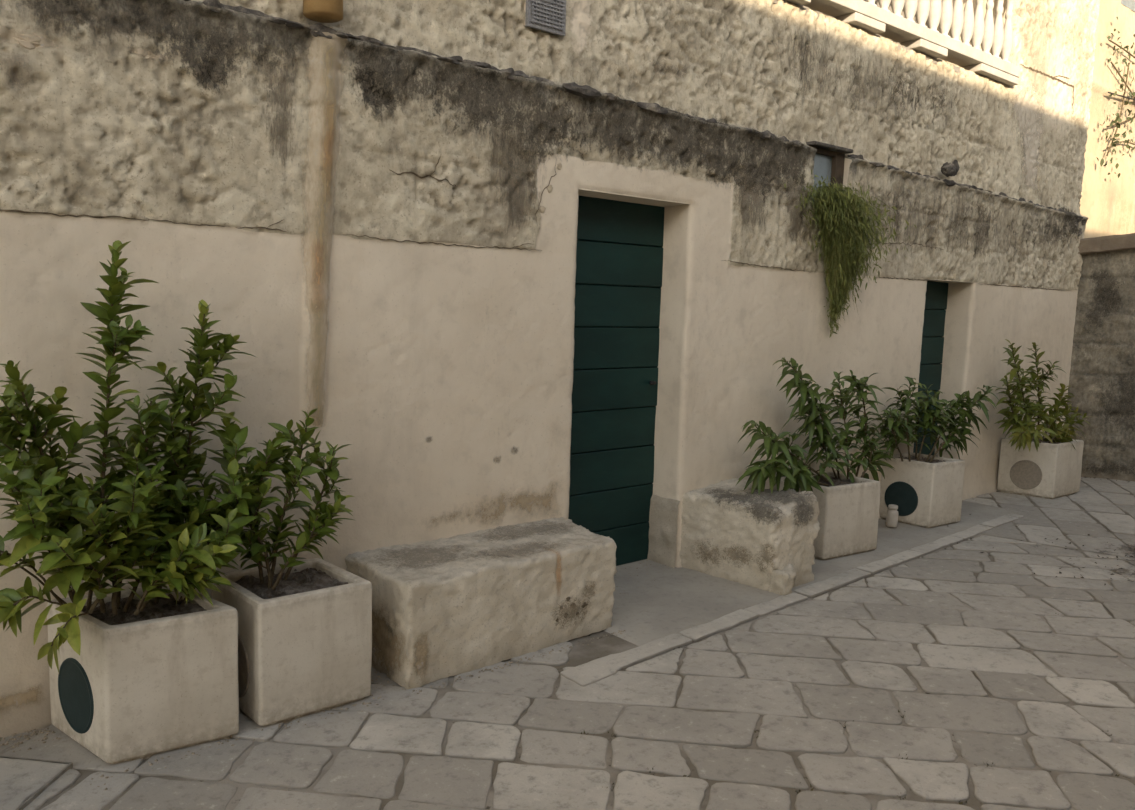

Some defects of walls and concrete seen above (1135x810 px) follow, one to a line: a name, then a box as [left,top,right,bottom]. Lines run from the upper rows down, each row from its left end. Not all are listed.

leakage [22,0,296,161]
crack [389,156,456,186]
leakage [350,39,810,239]
leakage [789,36,919,105]